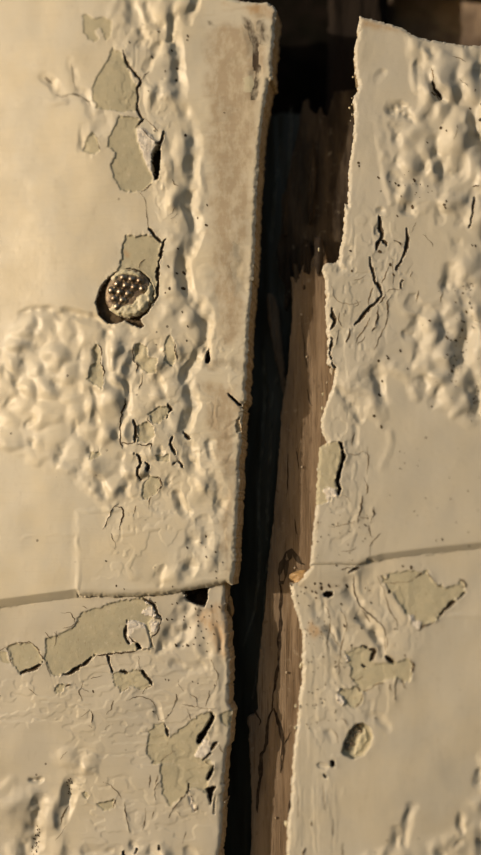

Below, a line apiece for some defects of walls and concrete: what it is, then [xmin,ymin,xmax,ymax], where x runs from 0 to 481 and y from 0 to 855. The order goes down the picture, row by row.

peeling [83,14,161,192]
peeling [96,234,161,328]
crack [330,216,433,368]
peeling [316,442,347,505]
peeling [0,596,159,694]
crack [0,599,219,855]
peeling [146,710,232,814]
spalling [184,588,209,606]
crack [254,583,290,813]
peeling [336,646,413,709]
peeling [382,570,465,629]
crack [288,785,343,855]